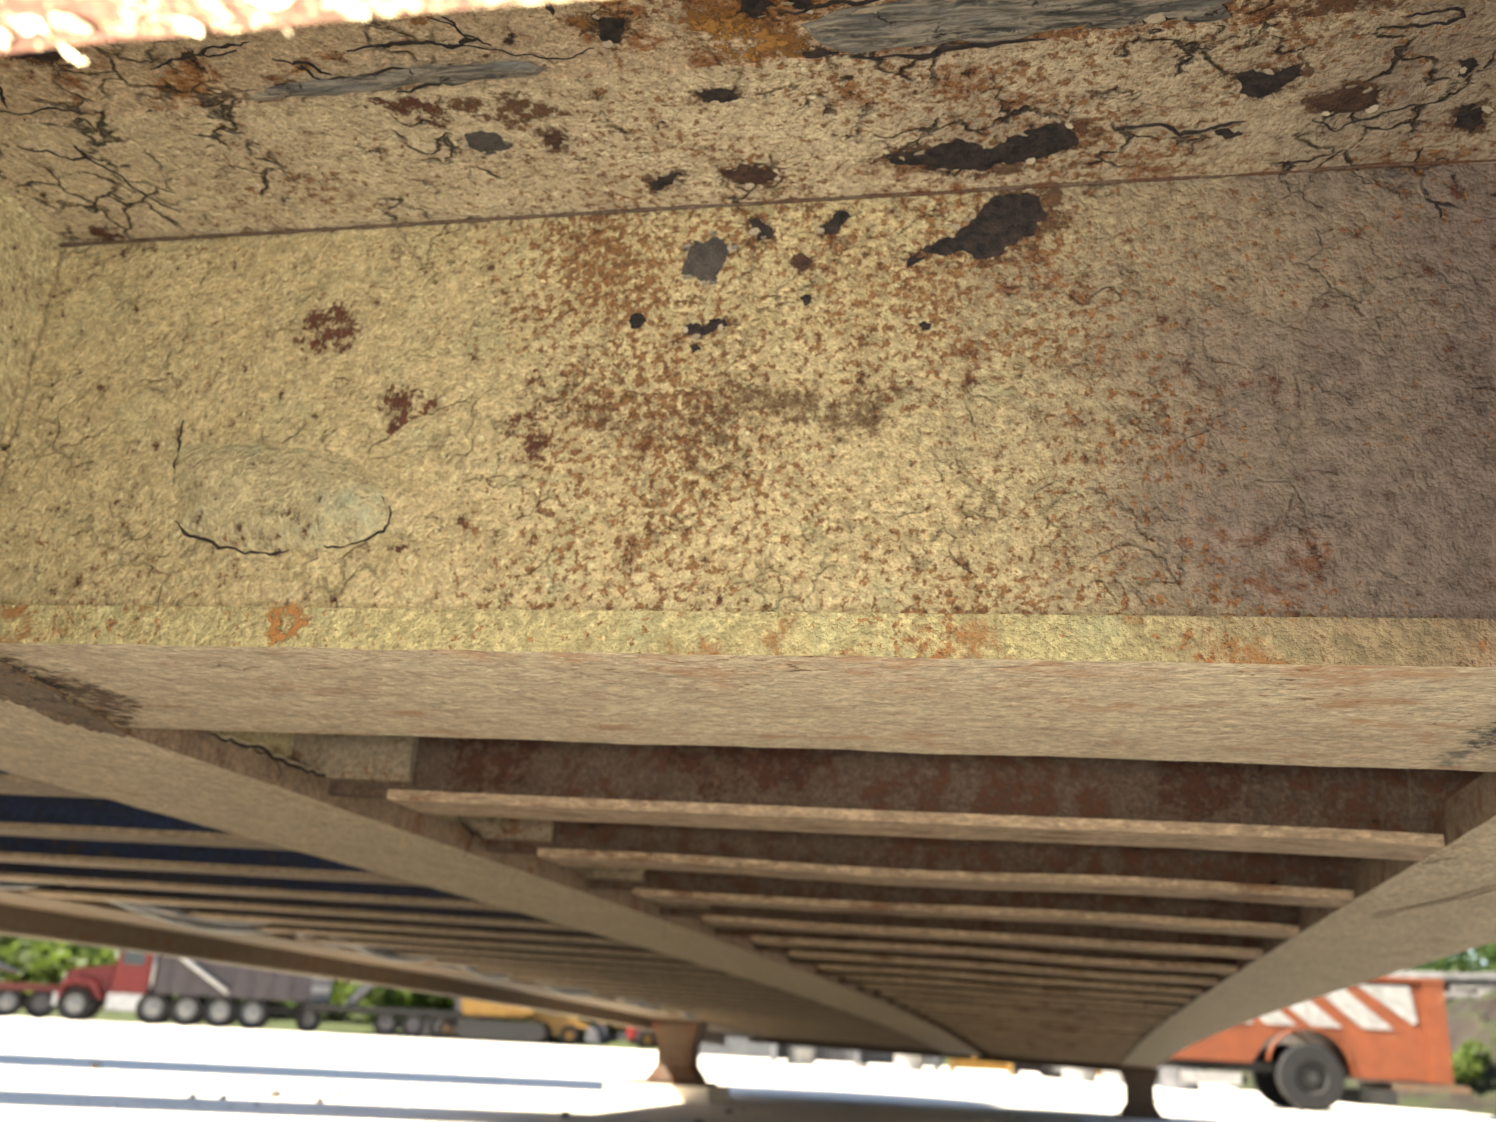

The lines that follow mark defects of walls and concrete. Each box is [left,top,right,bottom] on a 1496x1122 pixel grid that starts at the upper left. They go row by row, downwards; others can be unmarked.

rust [6,47,62,71]
peeling [0,13,92,66]
peeling [176,17,202,37]
peeling [334,0,369,20]
crack [150,16,594,80]
rust [668,1,811,63]
crack [1376,7,1466,30]
crack [0,86,181,212]
crack [1116,121,1245,140]
spalling [858,117,1108,270]
rust [293,300,361,355]
rust [264,603,308,645]